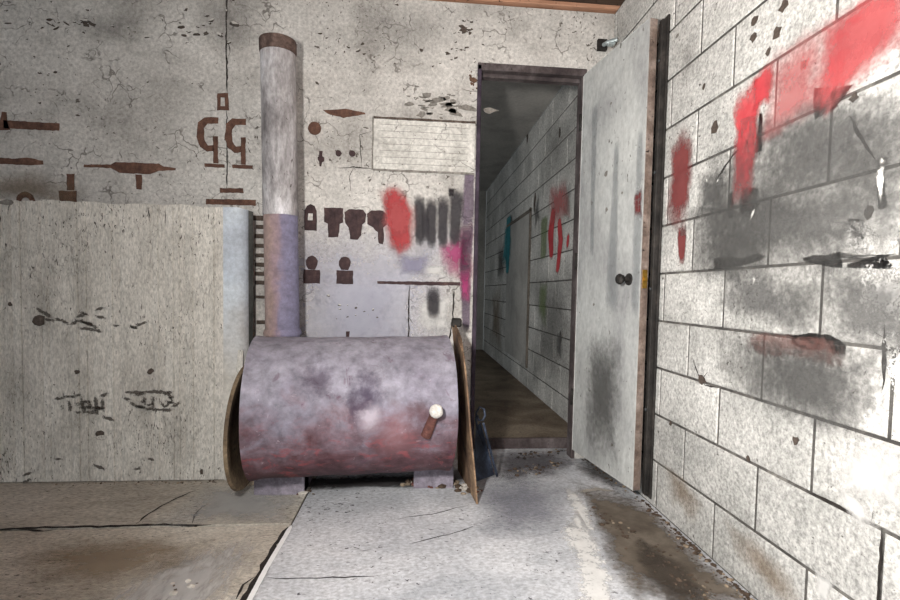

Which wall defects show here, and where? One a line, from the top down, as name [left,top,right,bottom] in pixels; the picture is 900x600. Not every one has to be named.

crack [0,489,206,532]
leakage [562,488,612,600]